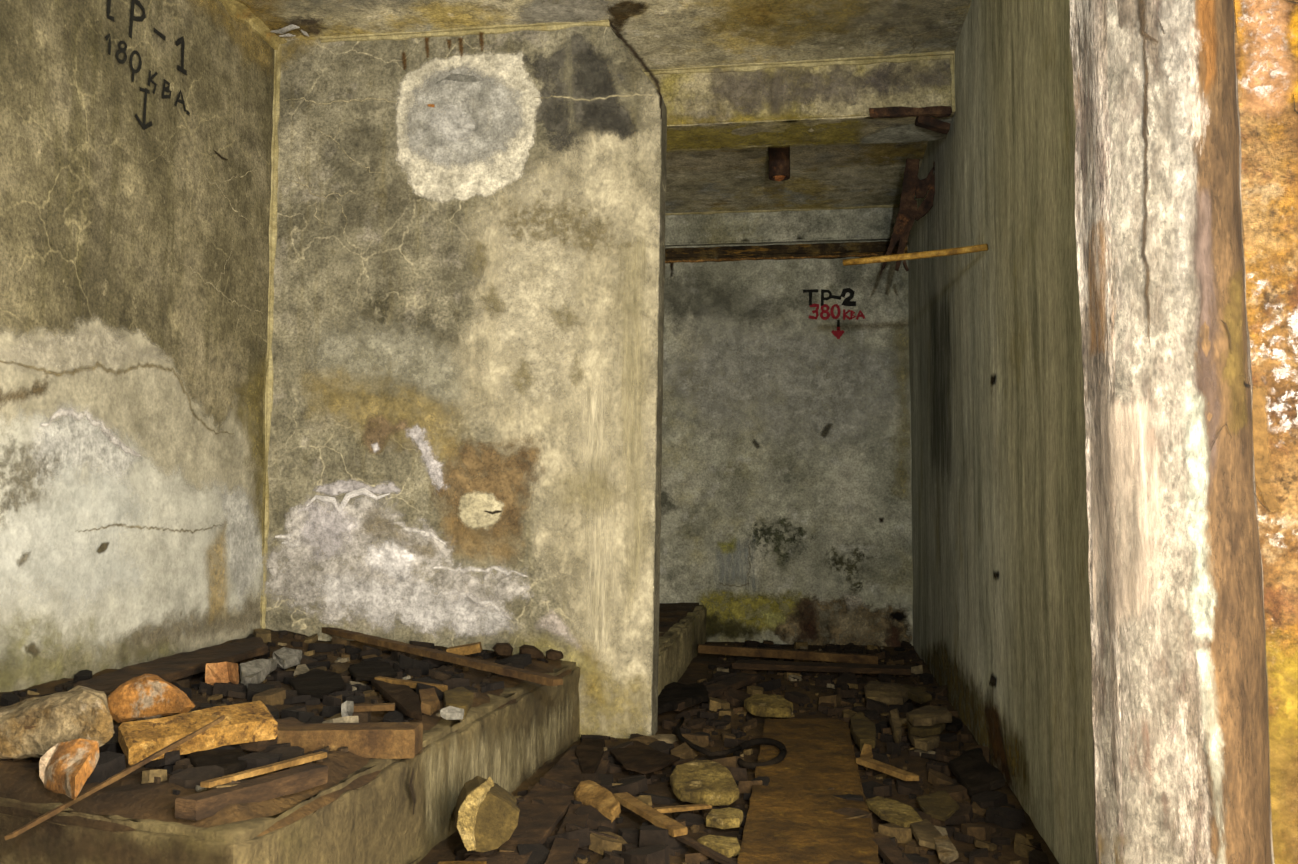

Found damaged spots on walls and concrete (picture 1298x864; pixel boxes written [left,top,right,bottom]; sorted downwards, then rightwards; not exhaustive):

leakage [519,0,647,151]
leakage [1238,4,1281,95]
rust [1235,0,1298,112]
crack [1139,0,1165,343]
leakage [1250,306,1298,432]
leakage [0,318,529,692]
rust [312,379,539,555]